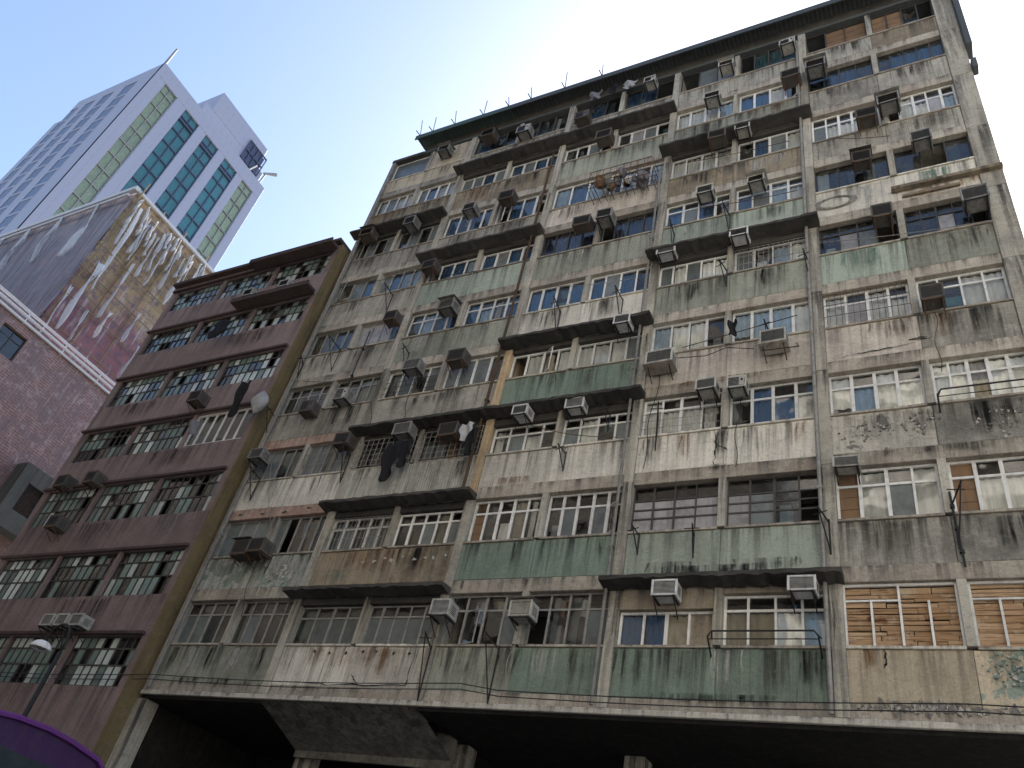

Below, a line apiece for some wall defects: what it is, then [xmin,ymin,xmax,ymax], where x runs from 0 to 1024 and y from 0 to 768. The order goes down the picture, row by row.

flaking render [838,409,941,444]